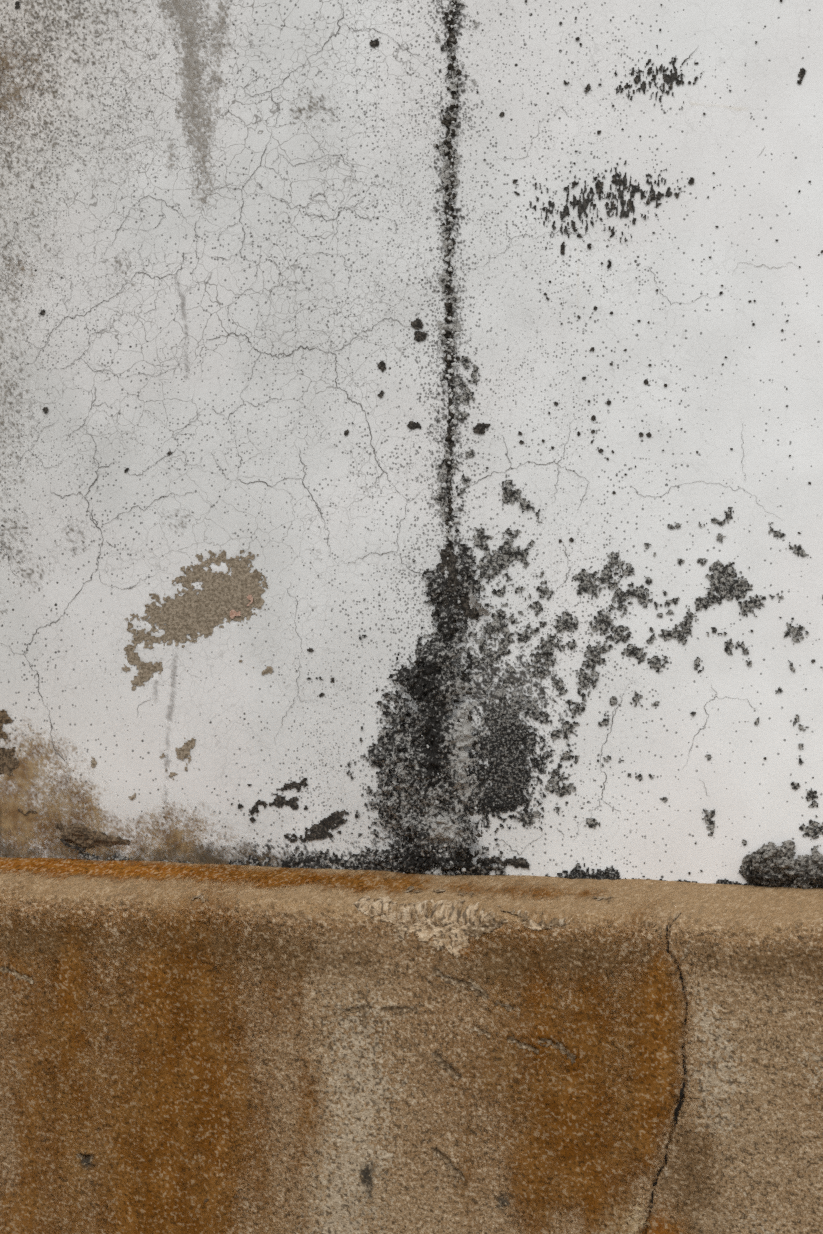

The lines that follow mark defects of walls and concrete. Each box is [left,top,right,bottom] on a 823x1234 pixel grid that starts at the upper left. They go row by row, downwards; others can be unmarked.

crack [0,0,595,779]
mould [494,474,544,523]
peeling [122,550,268,690]
leakage [455,524,784,813]
leakage [0,733,390,871]
corrosion [0,857,428,893]
spalling [354,886,567,958]
mould [545,858,645,880]
mould [714,782,823,889]
corrosion [52,934,258,1234]
corrosion [511,950,636,1226]
crack [644,913,691,1234]